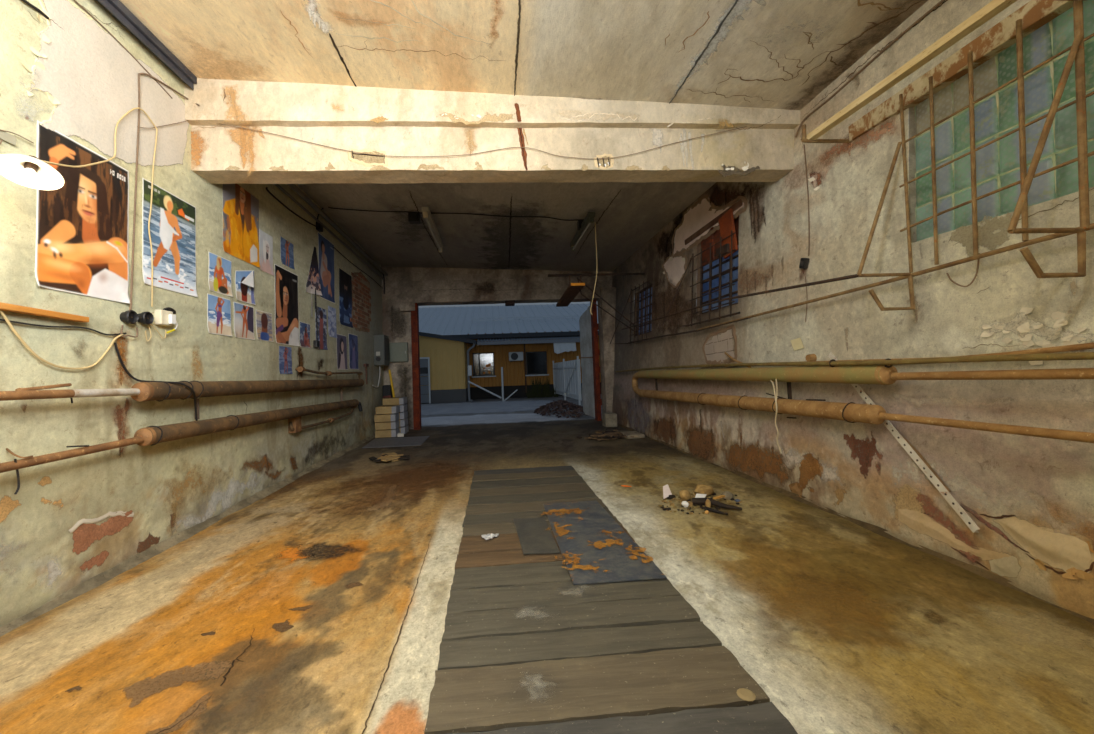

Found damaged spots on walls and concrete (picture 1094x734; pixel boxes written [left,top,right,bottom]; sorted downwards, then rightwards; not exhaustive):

peeling [21,0,189,166]
crack [281,0,521,96]
crack [665,0,948,130]
rust [514,103,528,170]
flaking render [662,195,748,289]
peeling [0,495,21,523]
flaking render [69,510,134,572]
flaking render [137,534,160,553]
rust [278,547,306,562]